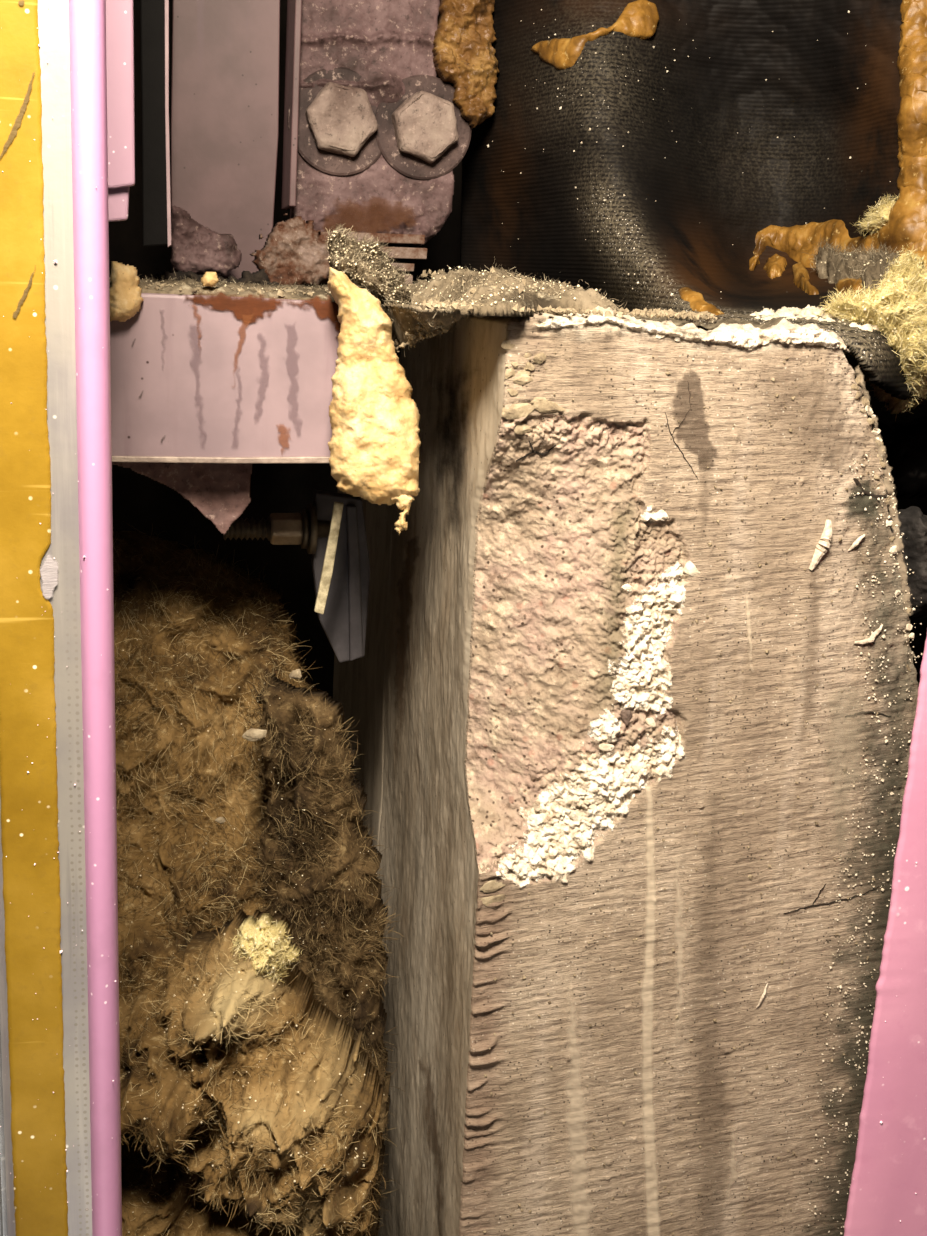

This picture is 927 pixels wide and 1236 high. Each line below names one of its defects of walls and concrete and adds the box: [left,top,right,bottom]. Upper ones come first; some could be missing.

corrosion [186,197,415,366]
spalling [535,315,849,351]
corrosion [278,425,289,450]
water stain [674,373,716,468]
spalling [466,340,700,906]
water stain [641,787,660,1236]
water stain [675,879,686,1004]
water stain [567,1016,593,1236]